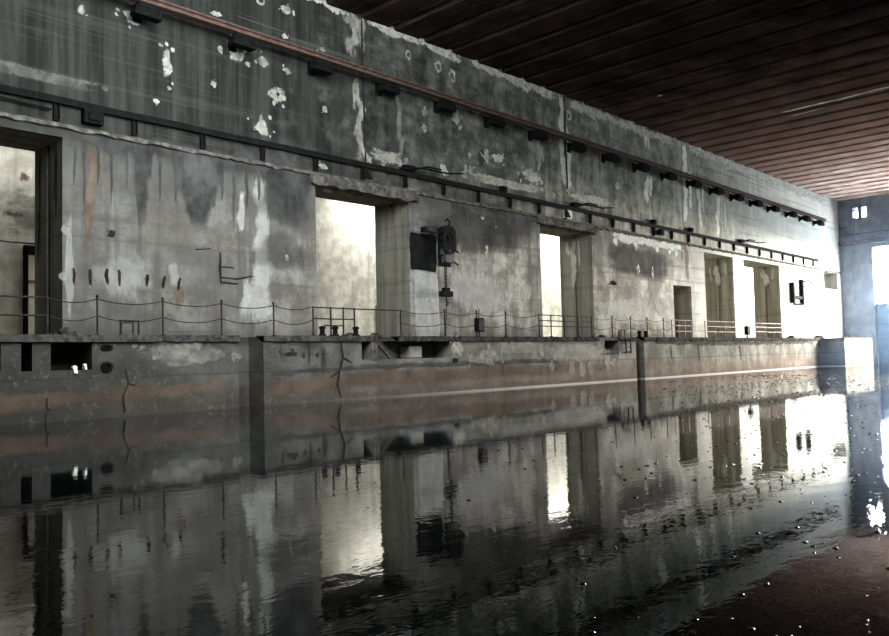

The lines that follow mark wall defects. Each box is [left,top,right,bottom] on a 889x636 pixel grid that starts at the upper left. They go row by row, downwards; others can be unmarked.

spalling [158,41,175,90]
spalling [244,87,286,138]
water stain [73,134,307,225]
spalling [367,149,408,167]
water stain [612,247,667,277]